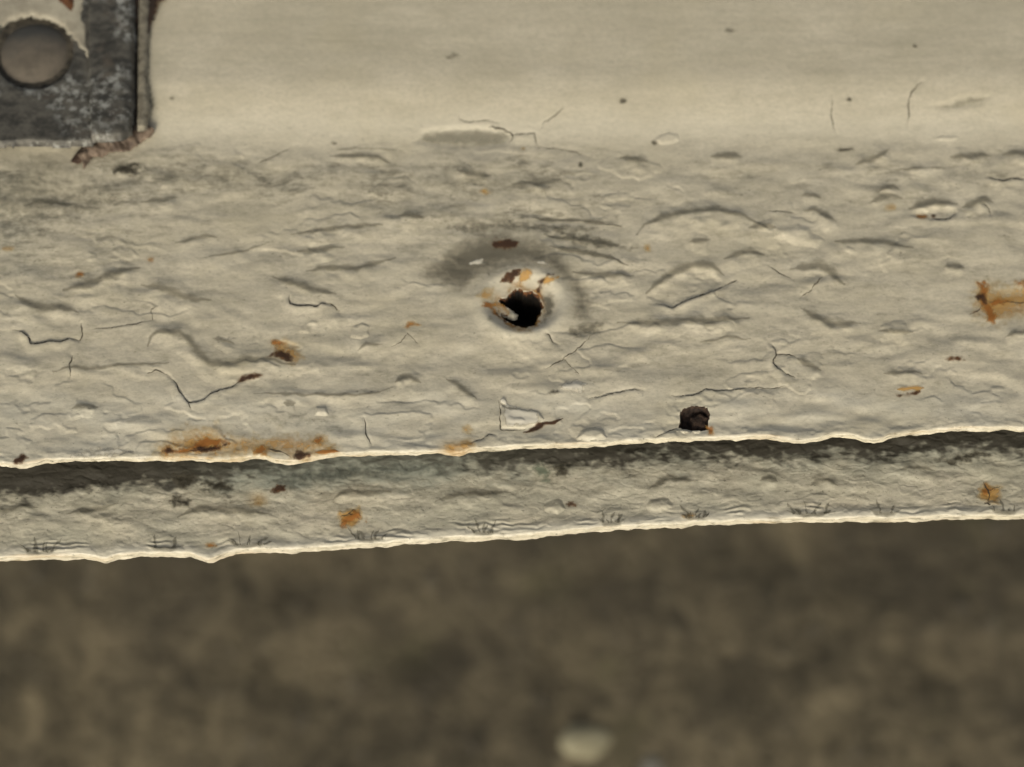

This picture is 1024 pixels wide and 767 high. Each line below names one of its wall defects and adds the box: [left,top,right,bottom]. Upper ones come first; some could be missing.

peeling [59,0,74,11]
damp [546,235,626,265]
corrosion [971,281,1024,323]
crack [16,307,155,376]
corrosion [270,340,296,361]
crack [543,333,586,376]
crack [151,369,243,408]
corrosion [165,434,338,460]
damp [939,451,990,465]
damp [169,474,195,507]
damp [208,481,233,491]
corrosion [339,509,361,527]